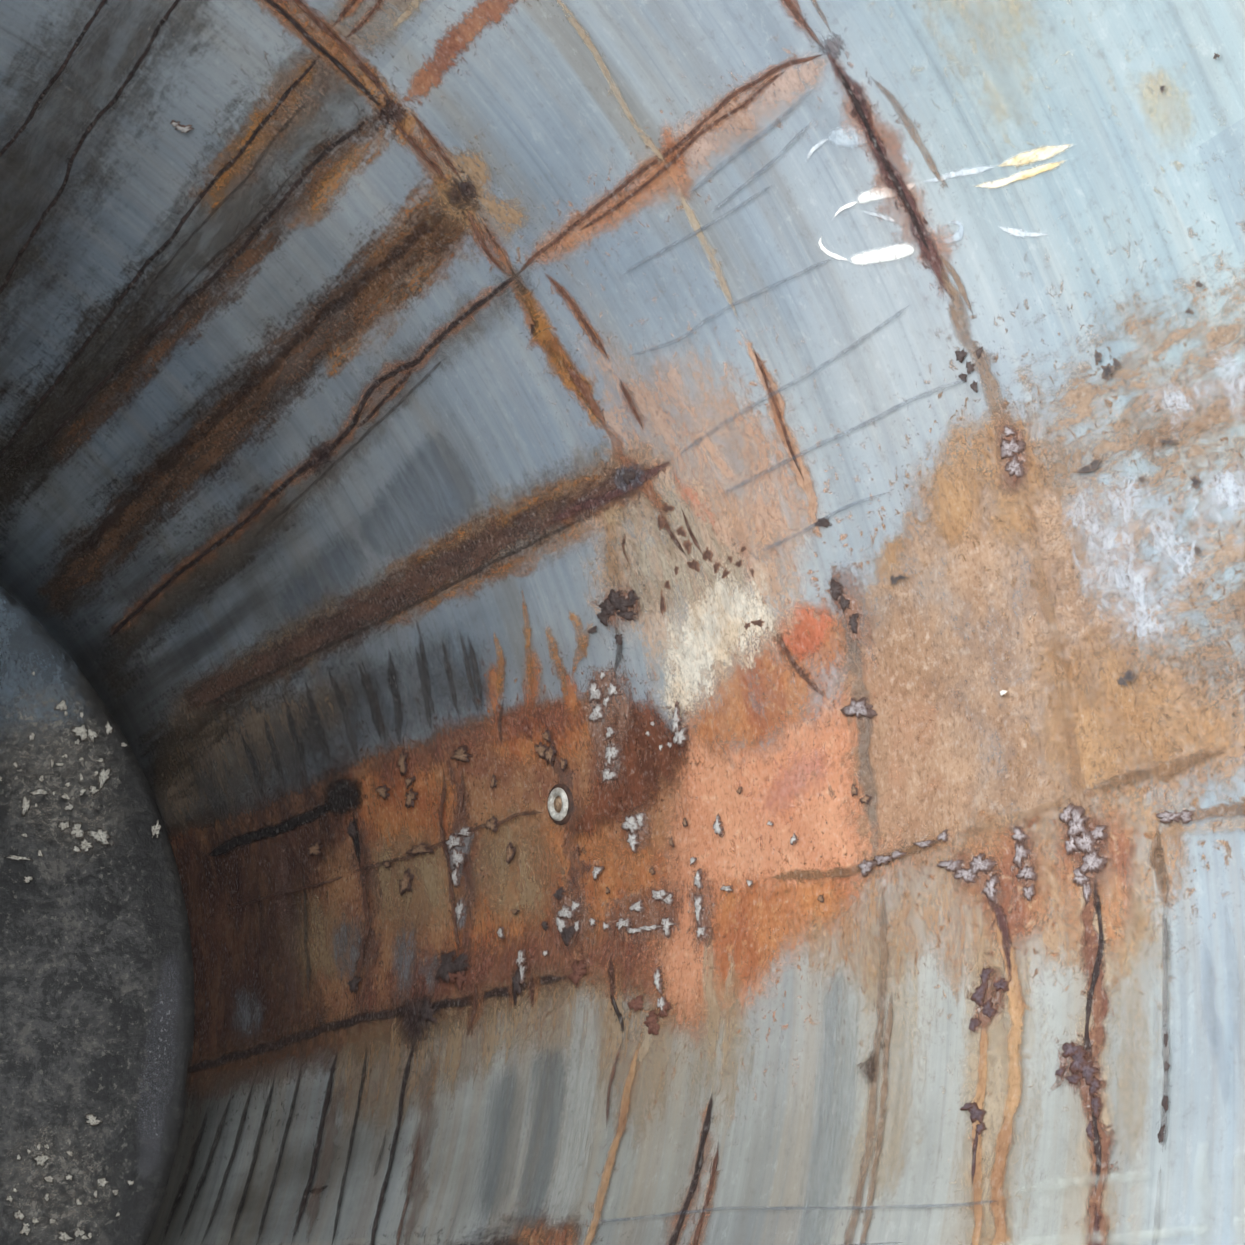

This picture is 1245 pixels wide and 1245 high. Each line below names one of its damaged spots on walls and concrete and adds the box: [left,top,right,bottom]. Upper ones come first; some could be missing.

corrosion [327,0,419,51]
corrosion [398,0,517,108]
crack [109,0,669,637]
corrosion [519,55,820,274]
crack [681,195,733,306]
crack [747,343,832,536]
corrosion [170,263,1245,1245]
peeling [383,745,498,1025]
peeling [512,948,527,997]
peeling [541,857,753,957]
peeling [653,967,666,1012]
crack [773,567,1221,1245]